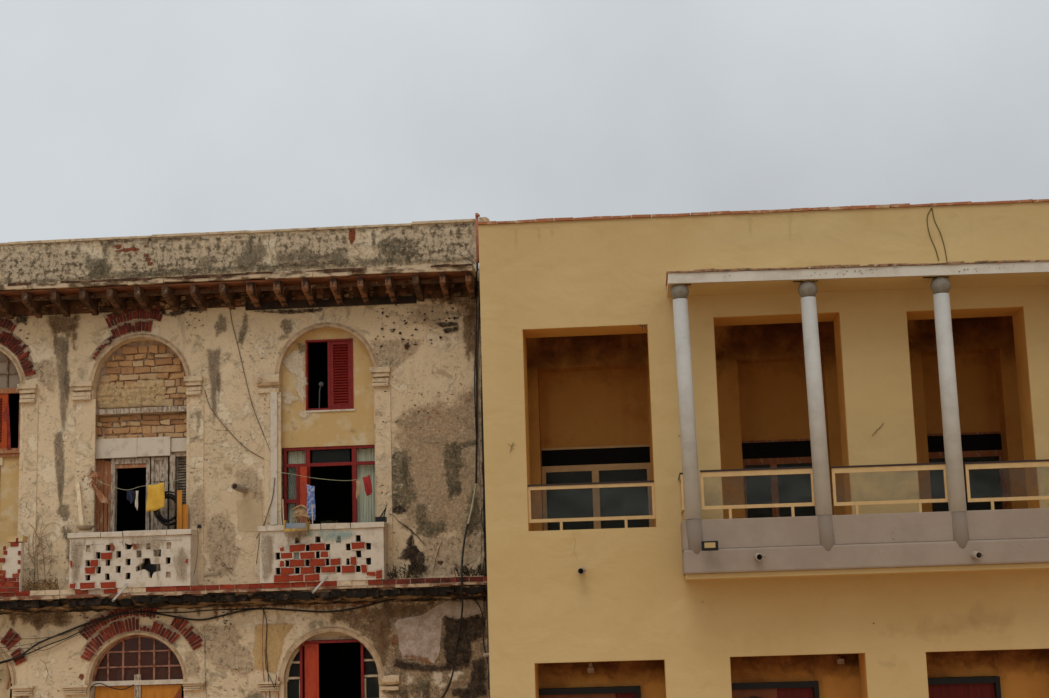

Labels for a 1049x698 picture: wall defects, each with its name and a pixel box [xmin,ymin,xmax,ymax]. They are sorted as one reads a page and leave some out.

leakage [77,245,112,277]
spalling [0,317,56,391]
spalling [90,306,163,360]
peeling [282,350,309,419]
leakage [430,294,481,359]
leakage [48,314,95,578]
leakage [392,450,445,569]
leakage [444,440,483,537]
flaking render [0,538,21,592]
spalling [273,542,383,583]
spalling [78,608,254,676]
leakage [264,597,489,698]